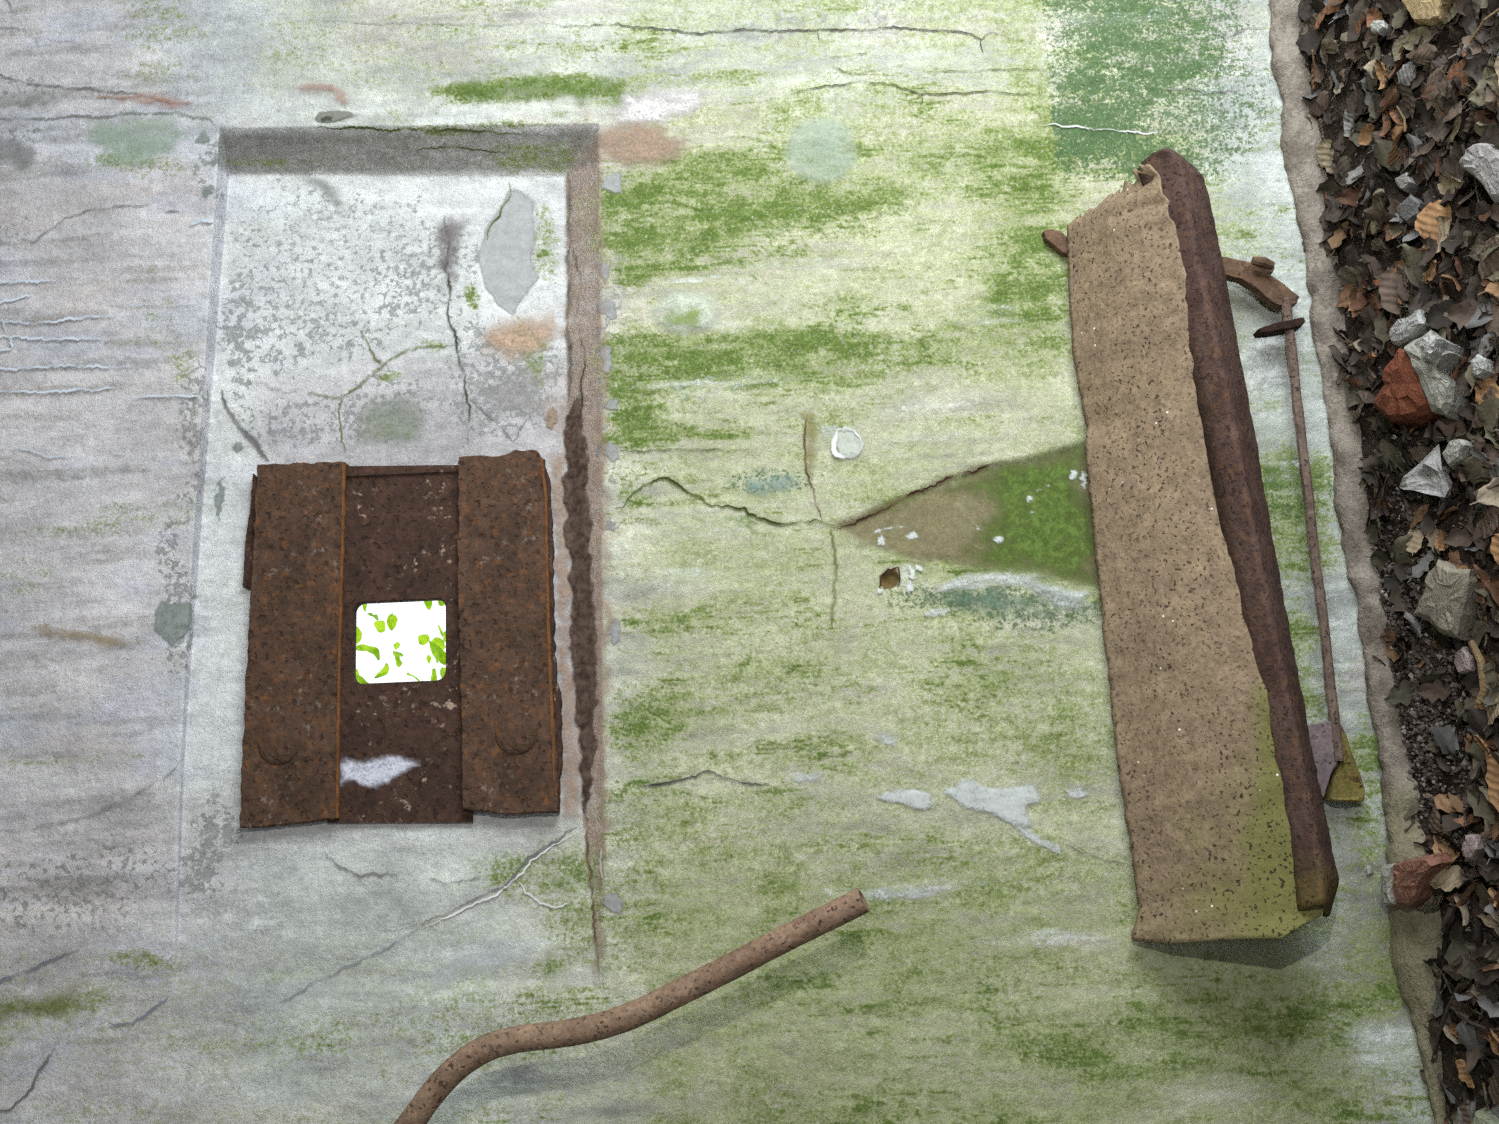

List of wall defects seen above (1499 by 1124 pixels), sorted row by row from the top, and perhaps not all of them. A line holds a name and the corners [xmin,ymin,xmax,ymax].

crack [0,73,217,127]
crack [324,20,1157,135]
crack [316,126,522,239]
flaking render [479,189,539,314]
crack [221,217,526,461]
corrosion [488,179,598,819]
crack [615,413,1005,629]
corrosion [335,463,346,818]
flaking render [877,779,1063,854]
flaking render [1065,788,1088,798]
crack [0,949,80,983]
crack [281,822,603,1001]